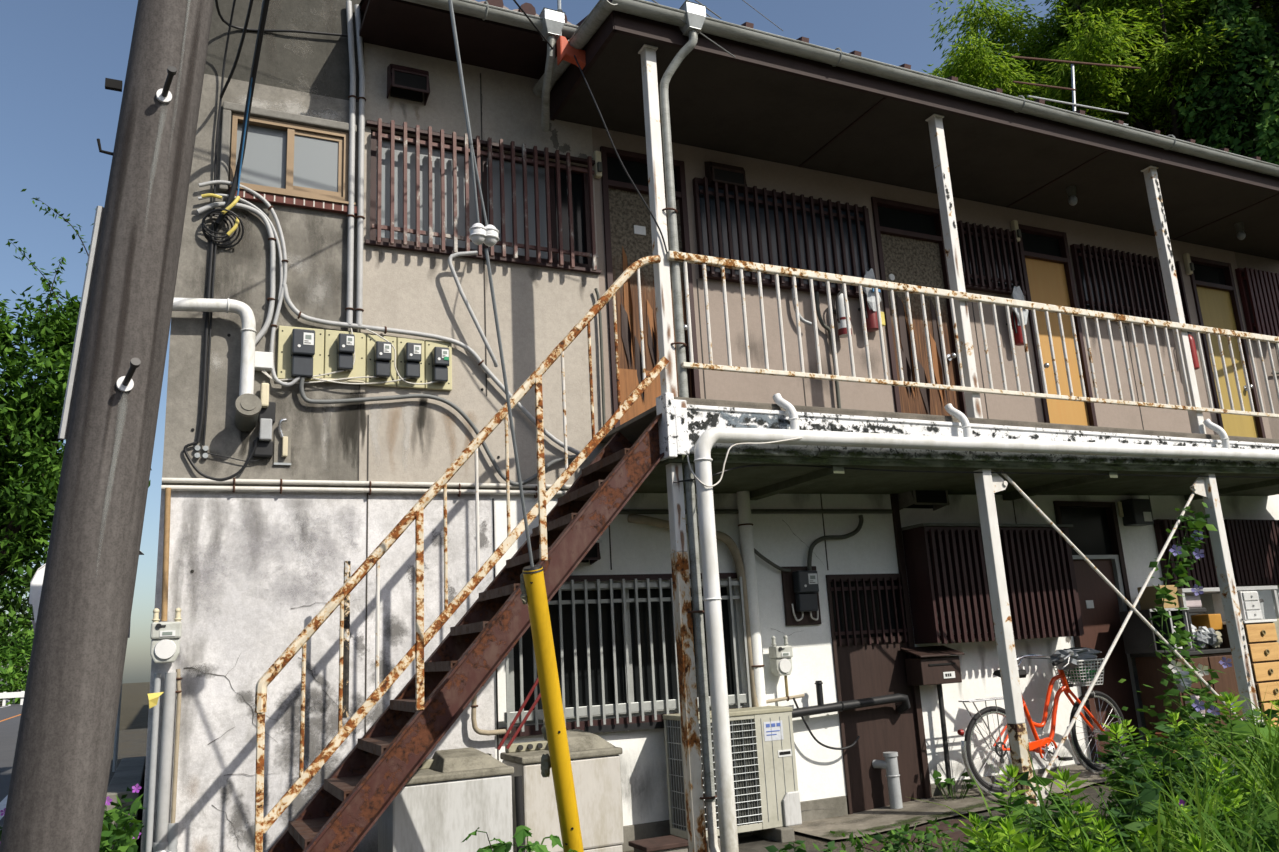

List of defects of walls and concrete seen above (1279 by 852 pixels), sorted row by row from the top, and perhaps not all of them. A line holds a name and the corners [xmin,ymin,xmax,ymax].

water stain [404,398,427,447]
peeling [668,399,939,444]
water stain [475,521,489,547]
water stain [350,633,366,651]
water stain [379,620,405,683]
crack [184,657,277,745]
water stain [239,691,257,717]
water stain [280,662,385,821]
water stain [221,781,267,847]